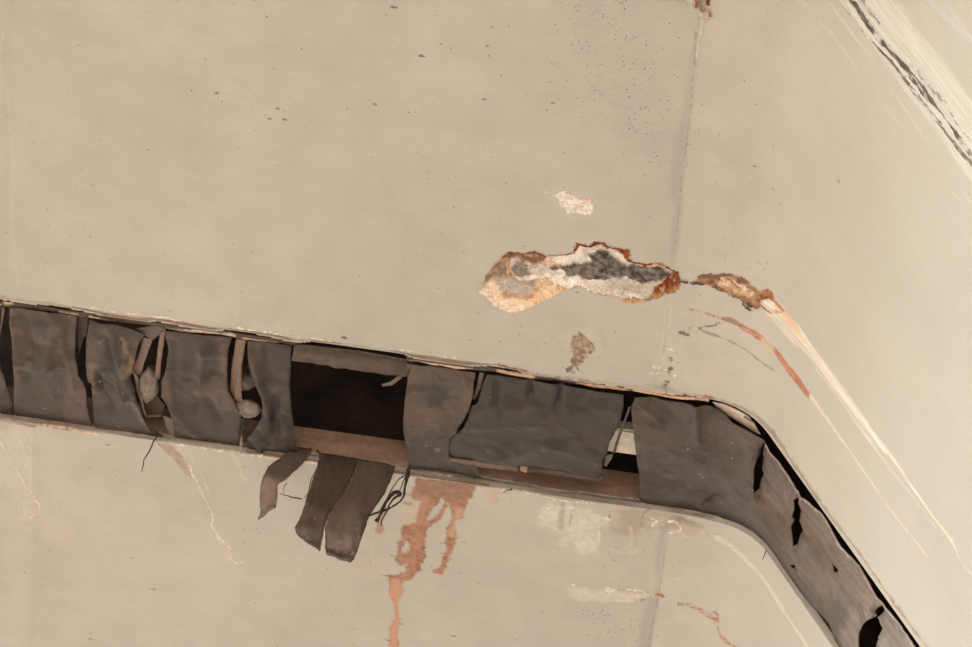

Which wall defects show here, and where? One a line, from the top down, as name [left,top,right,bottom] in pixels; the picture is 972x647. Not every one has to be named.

crack [838,0,972,167]
peeling [543,189,595,216]
spalling [477,239,785,315]
spalling [557,325,610,375]
peeling [0,418,111,446]
peeling [171,443,226,452]
corrosion [58,306,931,647]
peeling [501,487,602,505]
peeling [560,583,666,606]
peeling [676,601,740,647]